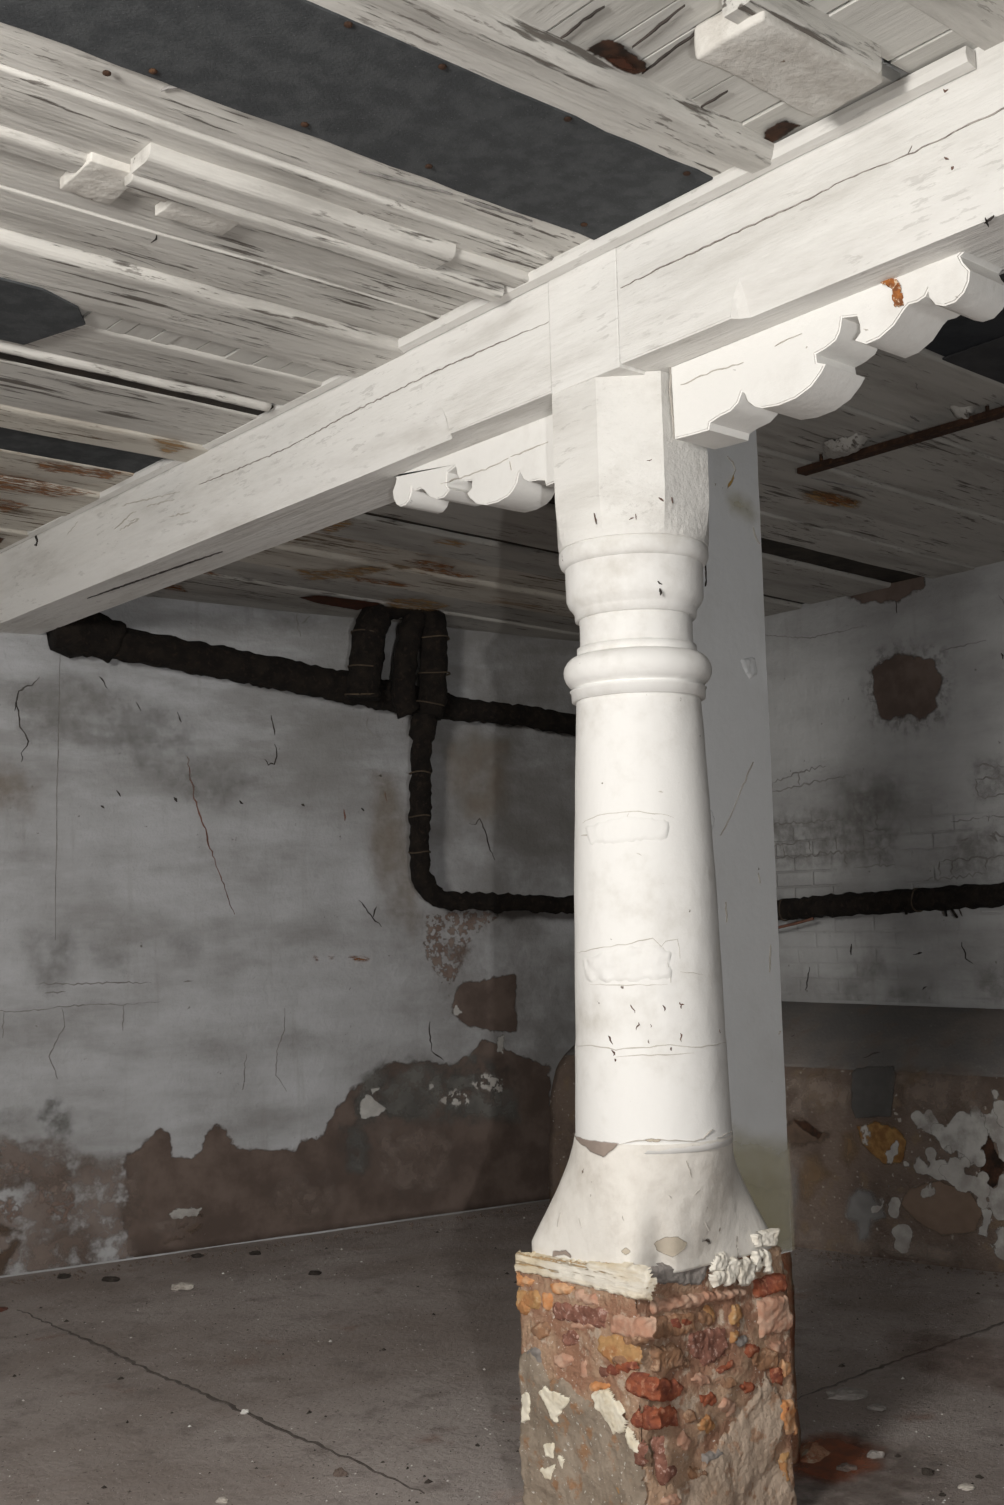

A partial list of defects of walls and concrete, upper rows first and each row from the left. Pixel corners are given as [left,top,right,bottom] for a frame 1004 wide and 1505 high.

crack [621,107,1004,288]
crack [669,333,808,439]
flaking render [872,653,942,721]
crack [15,654,61,940]
crack [187,757,235,914]
spalling [0,1198,22,1235]
flaking render [123,911,551,1257]
spalling [573,1133,617,1157]
peeling [846,1089,1004,1260]